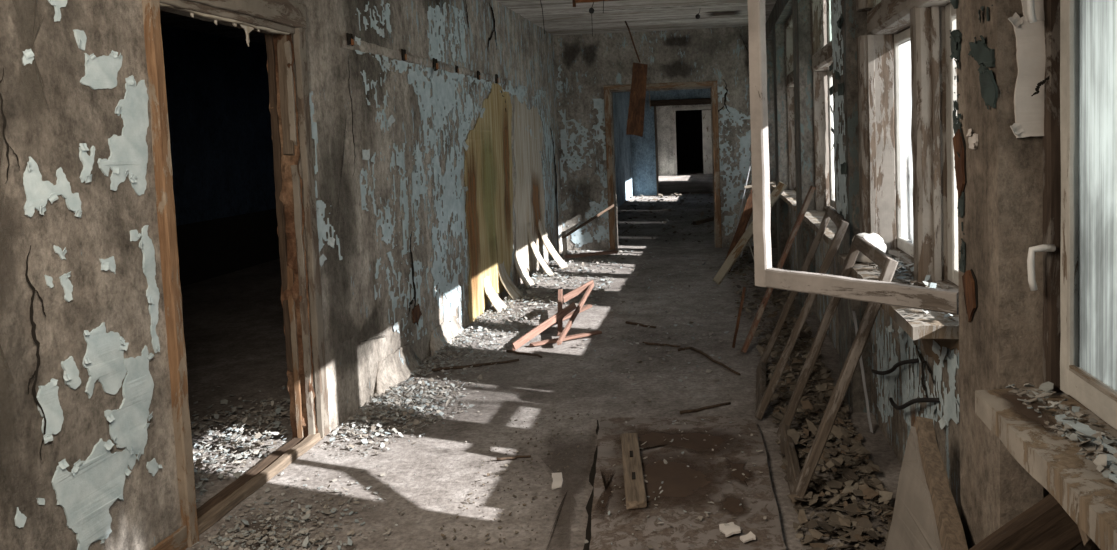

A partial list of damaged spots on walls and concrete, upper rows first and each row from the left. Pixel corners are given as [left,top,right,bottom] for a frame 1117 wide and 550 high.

peeling [48,0,67,22]
peeling [22,29,149,217]
peeling [346,0,609,343]
peeling [717,80,752,235]
spalling [948,5,998,322]
peeling [1008,0,1050,138]
peeling [36,225,162,550]
peeling [872,320,960,430]